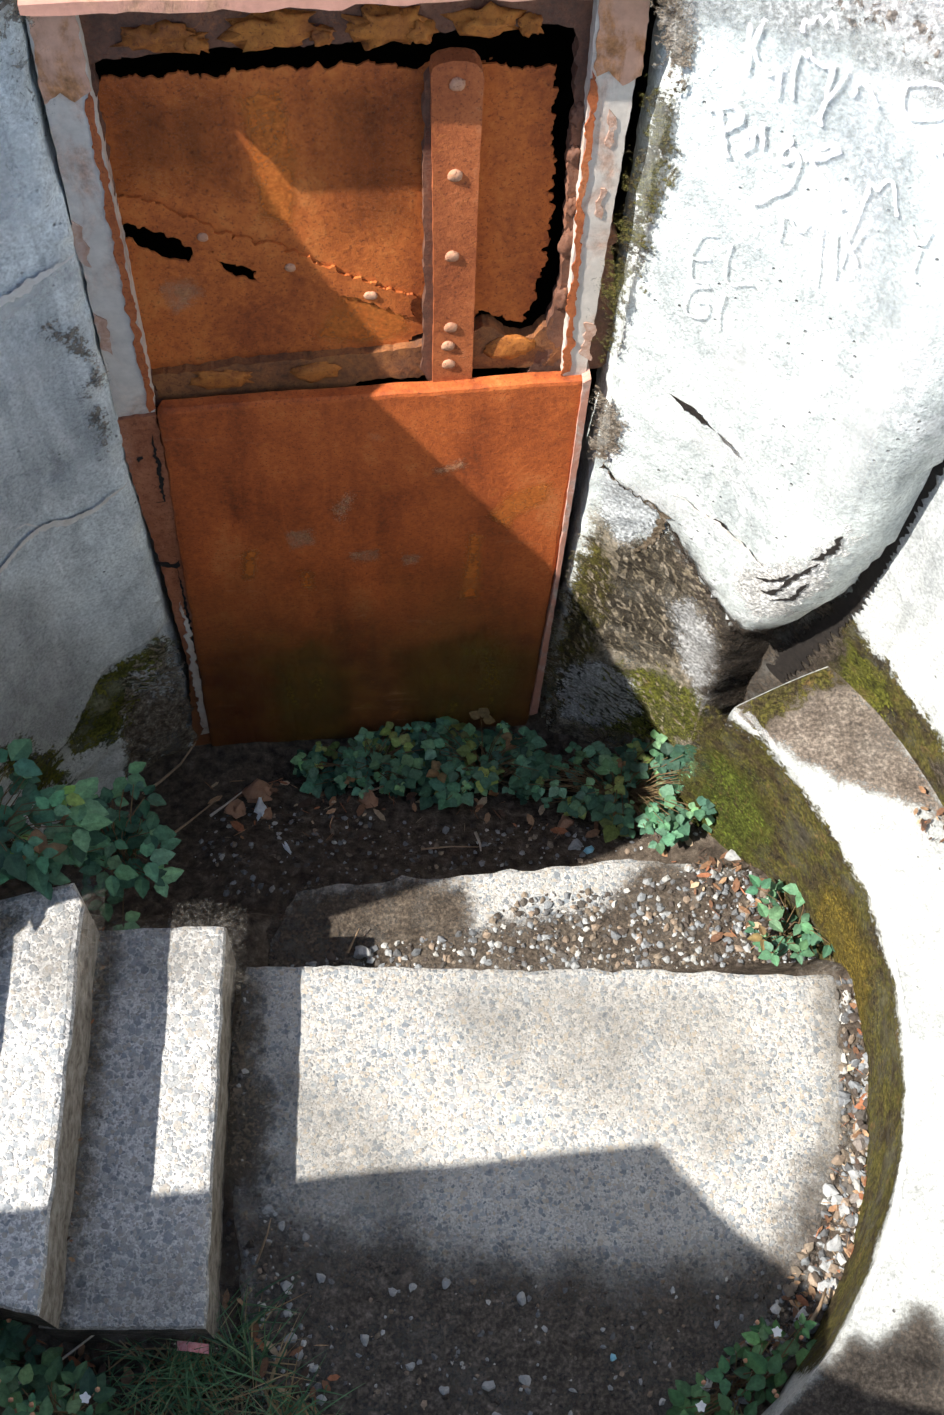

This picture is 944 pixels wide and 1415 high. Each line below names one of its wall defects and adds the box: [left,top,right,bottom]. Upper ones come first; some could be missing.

corrosion [110,1,544,55]
corrosion [189,369,255,390]
corrosion [290,361,342,383]
crack [599,464,776,579]
leakage [554,461,944,823]